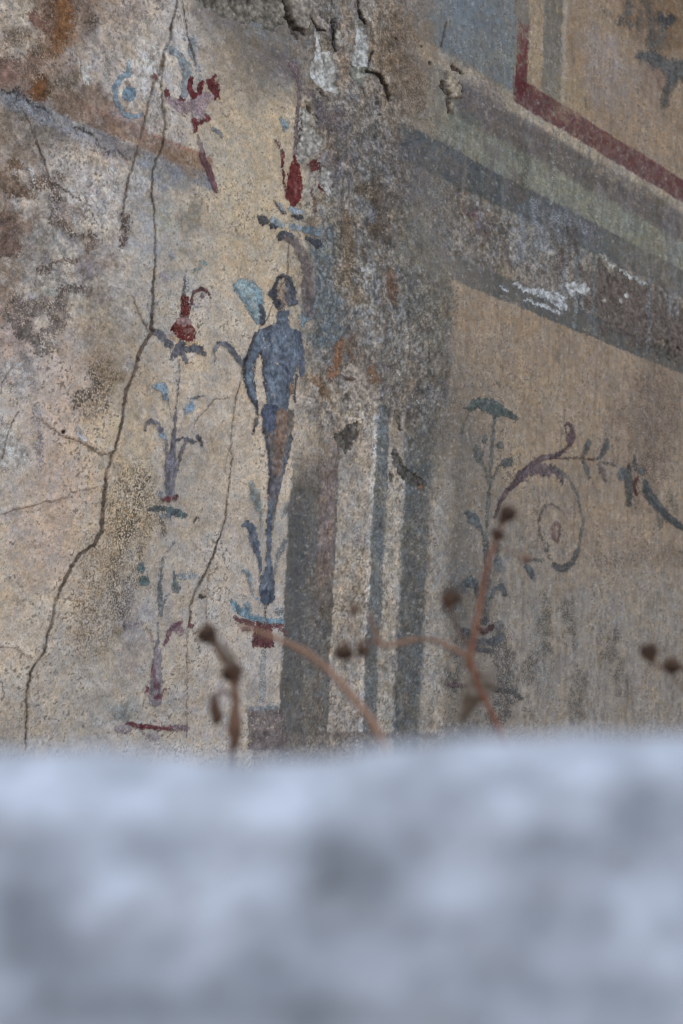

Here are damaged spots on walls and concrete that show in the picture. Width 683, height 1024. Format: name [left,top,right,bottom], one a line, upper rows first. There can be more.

spalling [310,7,372,100]
flaking render [439,64,462,114]
spalling [296,102,323,163]
spalling [319,166,335,198]
spalling [499,281,590,314]
spalling [599,252,647,285]
crack [3,0,196,750]
crack [186,459,233,664]